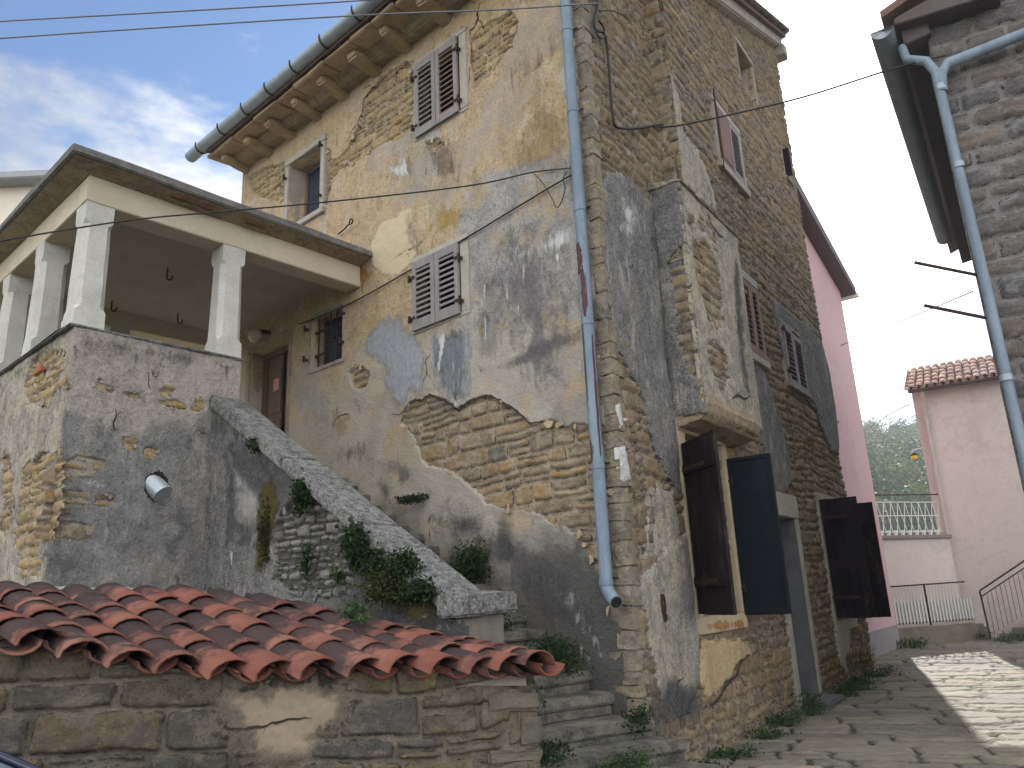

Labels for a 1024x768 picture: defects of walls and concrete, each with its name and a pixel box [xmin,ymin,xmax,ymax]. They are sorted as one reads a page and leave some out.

spalling [471,11,519,88]
spalling [324,62,414,208]
damp [484,226,579,380]
rust [576,242,588,317]
spalling [25,347,71,407]
damp [437,332,445,371]
spalling [350,315,631,575]
spalling [0,448,116,578]
crack [222,717,308,734]